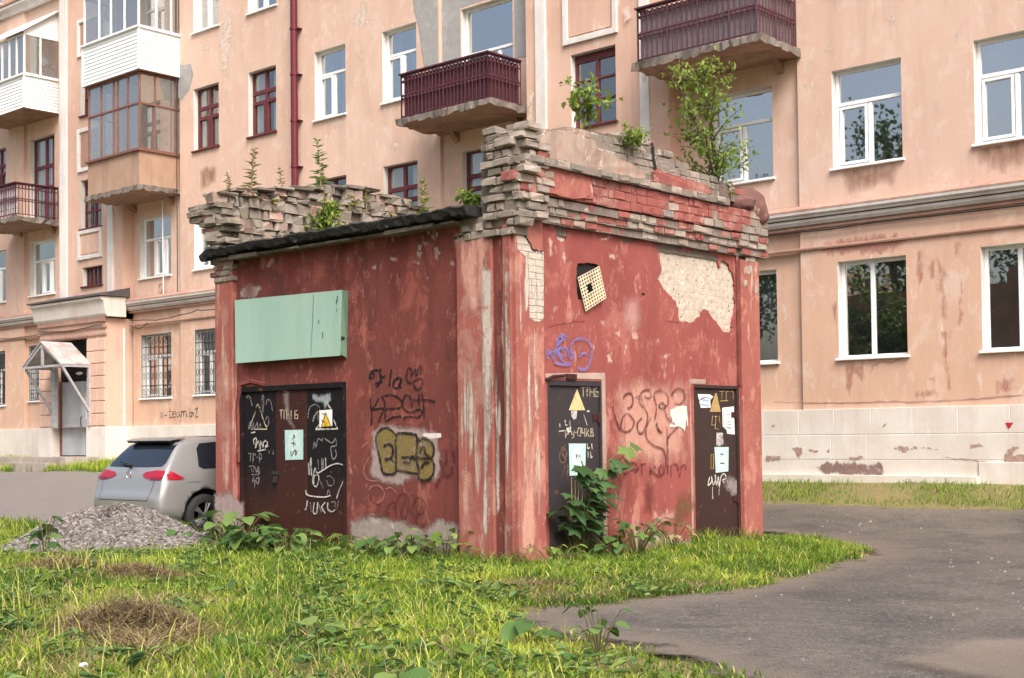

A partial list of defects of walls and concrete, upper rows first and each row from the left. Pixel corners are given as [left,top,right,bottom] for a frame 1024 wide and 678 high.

flaking render [658,252,759,332]
peeling [607,331,638,364]
flaking render [413,231,566,551]
peeling [1004,447,1024,462]
flaking render [350,471,471,555]